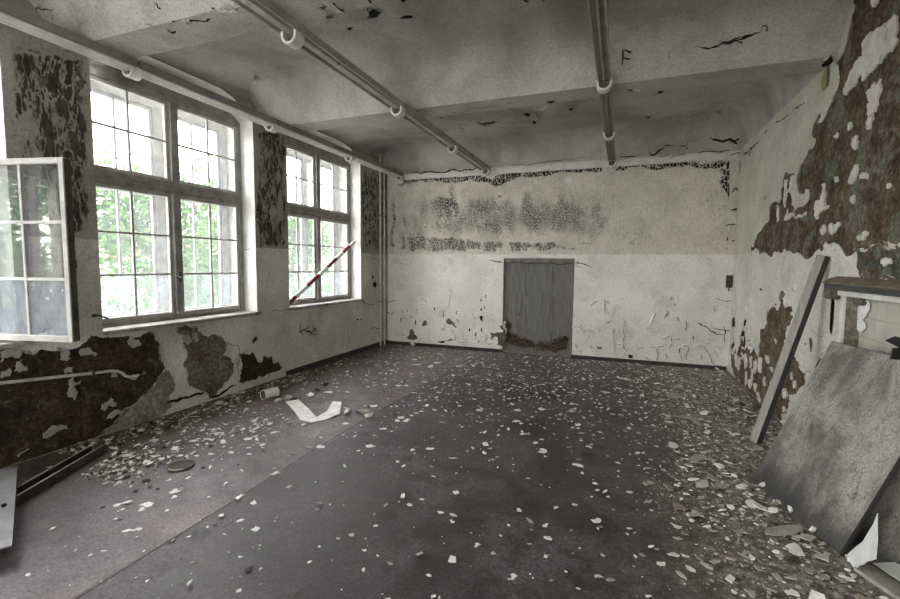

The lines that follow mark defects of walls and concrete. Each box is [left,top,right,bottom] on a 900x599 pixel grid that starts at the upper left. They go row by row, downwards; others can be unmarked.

crack [700,25,768,50]
peeling [12,53,89,233]
crack [621,103,804,157]
spalling [750,0,900,280]
peeling [256,132,286,247]
leakage [439,198,459,219]
leakage [390,203,573,252]
peeling [400,168,602,234]
spalling [0,331,175,469]
crack [166,342,240,404]
spalling [176,325,282,399]
spalling [730,283,797,404]